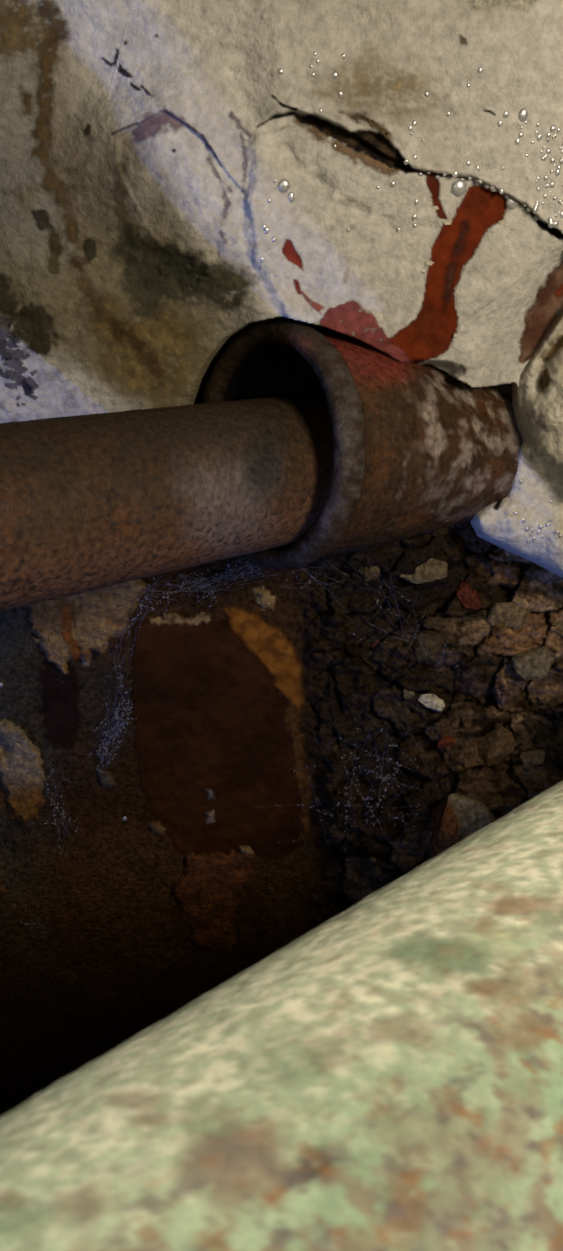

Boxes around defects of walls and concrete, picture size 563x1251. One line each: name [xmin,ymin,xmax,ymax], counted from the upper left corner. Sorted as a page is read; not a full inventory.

water stain [0,0,96,274]
crack [257,95,473,180]
water stain [114,163,251,316]
crack [515,200,563,238]
peeling [0,302,39,407]
water stain [0,274,59,355]
corrosion [302,292,416,364]
peeling [0,719,46,823]